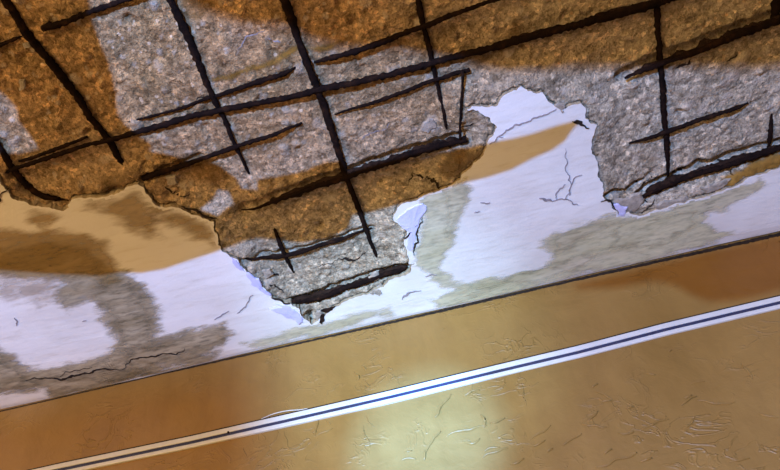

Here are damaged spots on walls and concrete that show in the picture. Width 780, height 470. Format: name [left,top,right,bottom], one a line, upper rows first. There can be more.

corrosion [213,39,344,81]
corrosion [100,176,123,194]
spalling [0,0,780,325]
corrosion [440,151,477,179]
crack [539,149,581,205]
corrosion [713,153,780,192]
leakage [106,194,211,239]
leakage [509,212,694,283]
leakage [0,215,224,377]
crack [0,232,780,412]